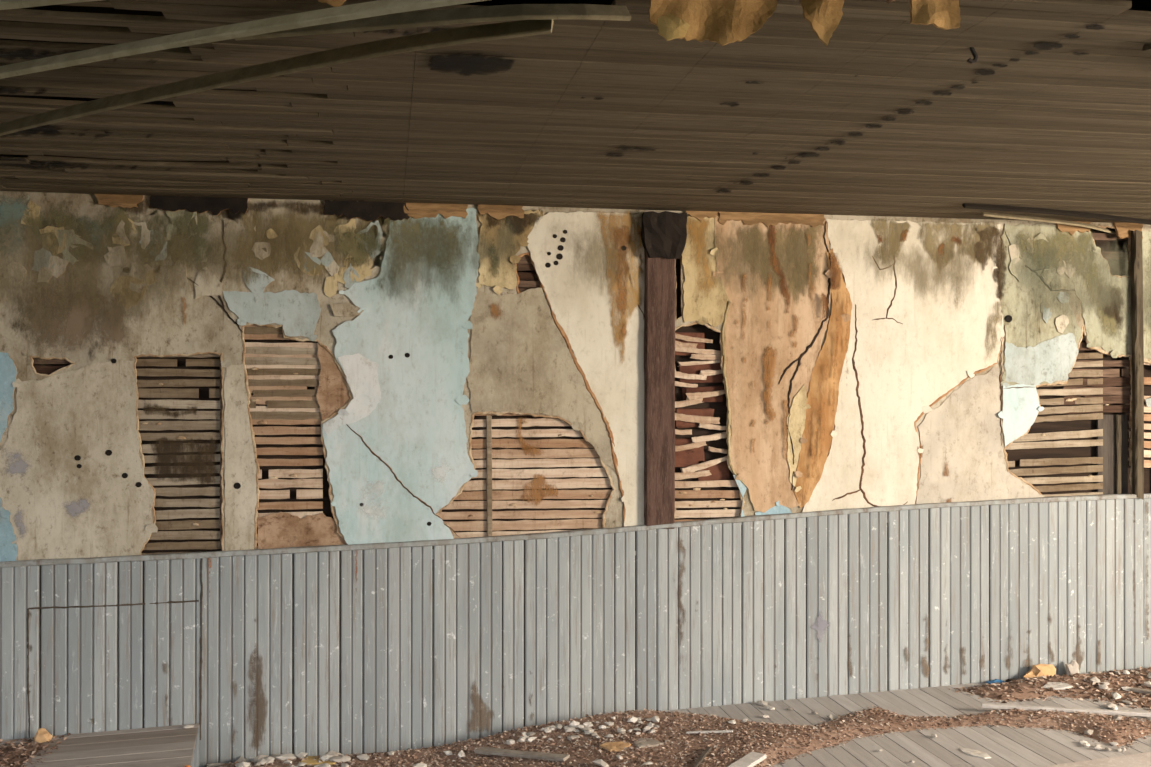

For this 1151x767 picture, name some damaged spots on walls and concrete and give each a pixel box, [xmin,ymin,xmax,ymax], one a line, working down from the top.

damp [428,53,514,76]
peeling [7,200,92,282]
damp [0,200,463,357]
damp [872,219,1007,345]
damp [1018,231,1131,335]
peeling [0,352,227,562]
peeling [104,208,645,559]
crack [779,222,908,507]
peeling [674,216,1151,525]